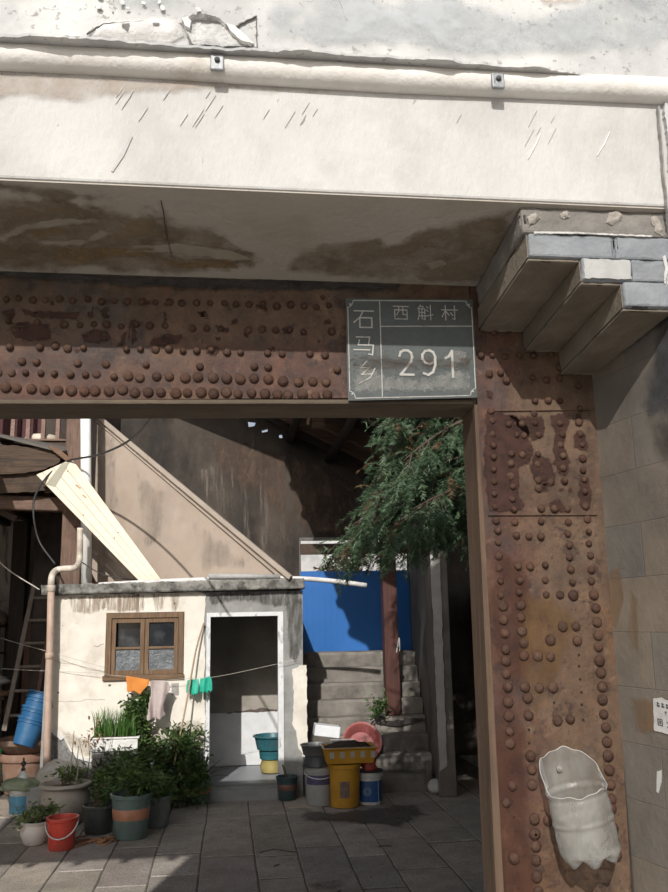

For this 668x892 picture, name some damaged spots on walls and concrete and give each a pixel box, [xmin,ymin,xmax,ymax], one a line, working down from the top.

flaking render [182,7,254,47]
water stain [0,188,506,291]
peeling [483,411,592,512]
water stain [79,594,143,613]
water stain [210,591,302,661]
flaking render [292,665,308,757]
rust [496,725,534,892]